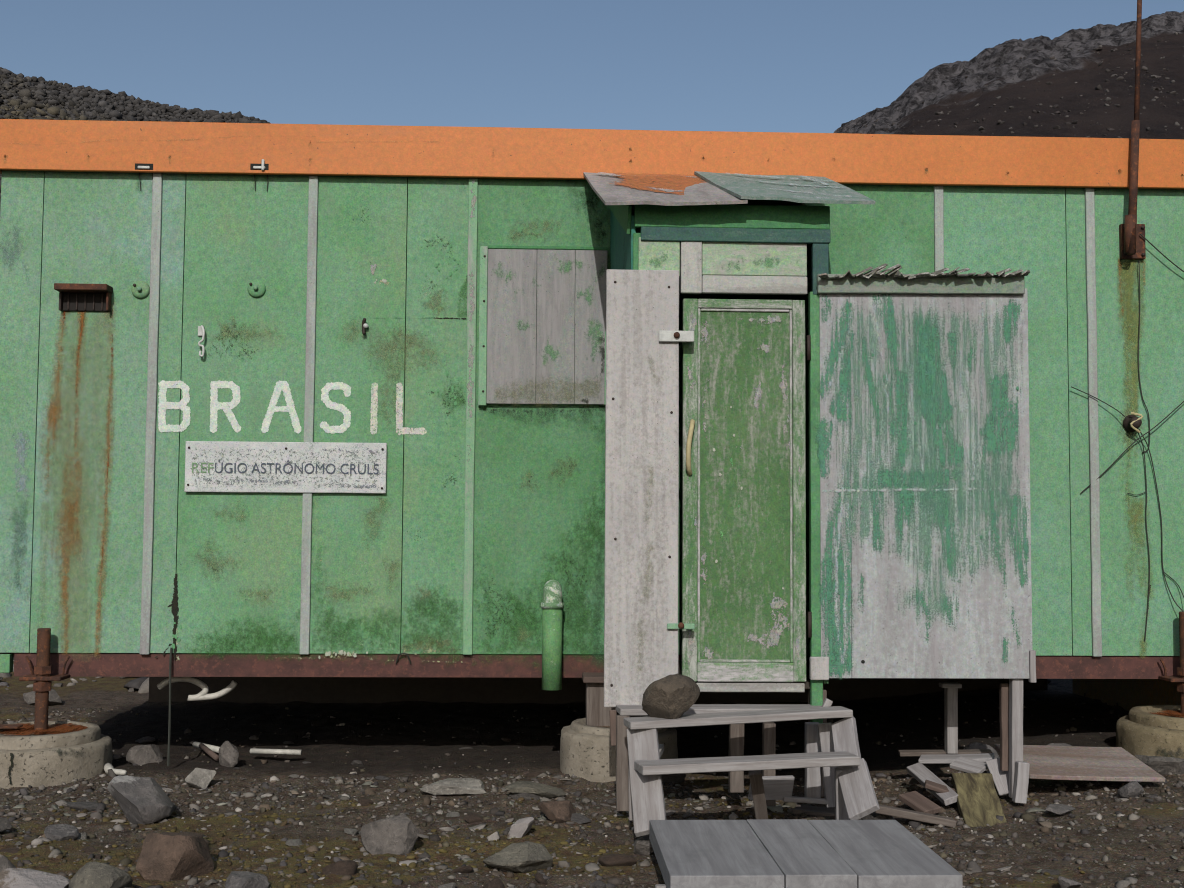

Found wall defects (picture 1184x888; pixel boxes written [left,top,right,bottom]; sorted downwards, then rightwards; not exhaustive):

peeling [595,172,706,195]
rust [76,311,85,393]
peeling [741,315,782,324]
rust [1119,260,1142,416]
peeling [816,294,1029,678]
crack [155,573,182,660]
peeling [748,587,800,659]
rust [1152,709,1184,718]
peeling [0,774,629,888]
peeling [664,779,753,818]
peeling [926,825,1042,888]
peeling [1016,794,1079,842]